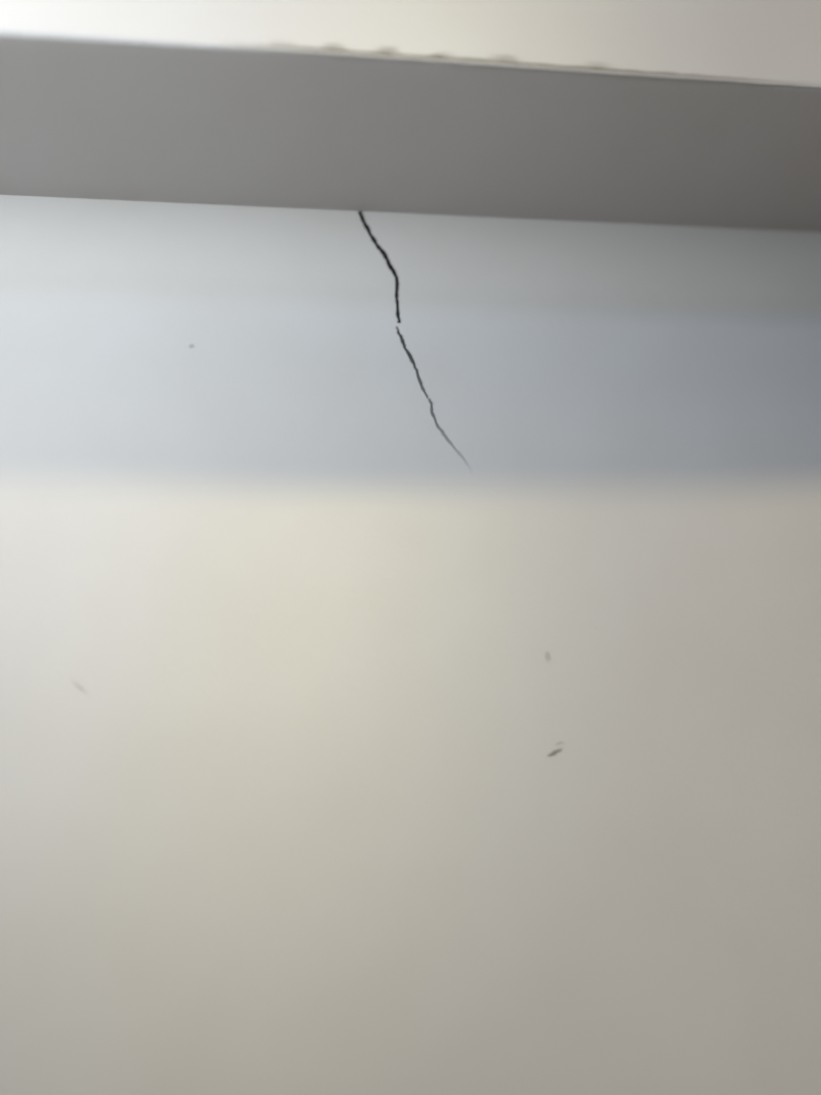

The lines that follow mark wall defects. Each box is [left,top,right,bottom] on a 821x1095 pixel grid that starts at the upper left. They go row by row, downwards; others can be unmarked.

crack [358,211,425,391]